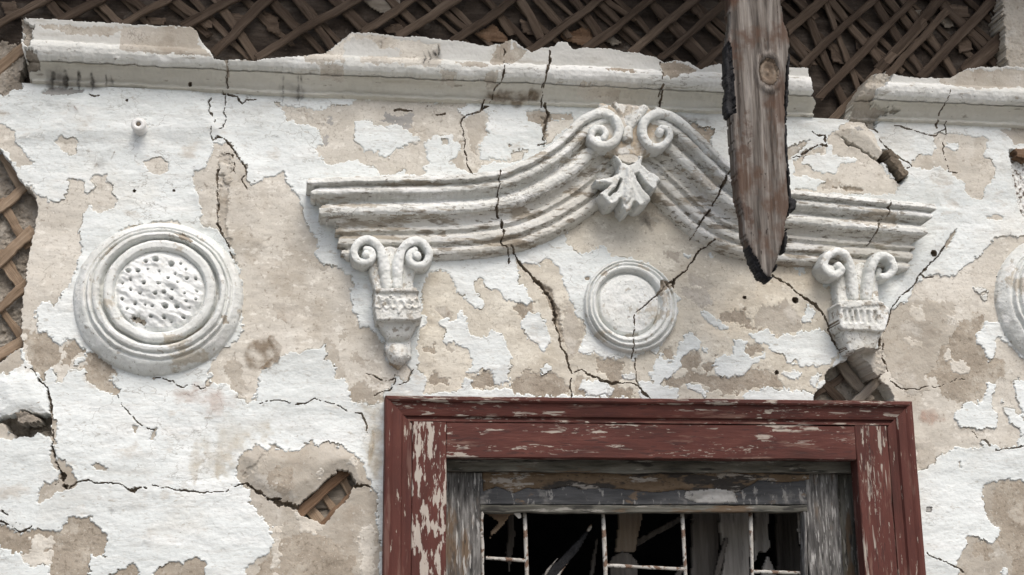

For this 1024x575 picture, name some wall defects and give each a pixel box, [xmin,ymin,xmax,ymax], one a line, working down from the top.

crack [208,68,257,259]
peeling [274,99,528,176]
crack [537,50,552,146]
peeling [0,124,121,395]
peeling [192,128,1024,471]
crack [495,169,730,399]
crack [771,274,849,353]
crack [25,366,299,510]
crack [260,369,414,433]
peeling [0,516,108,575]
peeling [236,440,382,575]
peeling [956,479,1024,575]